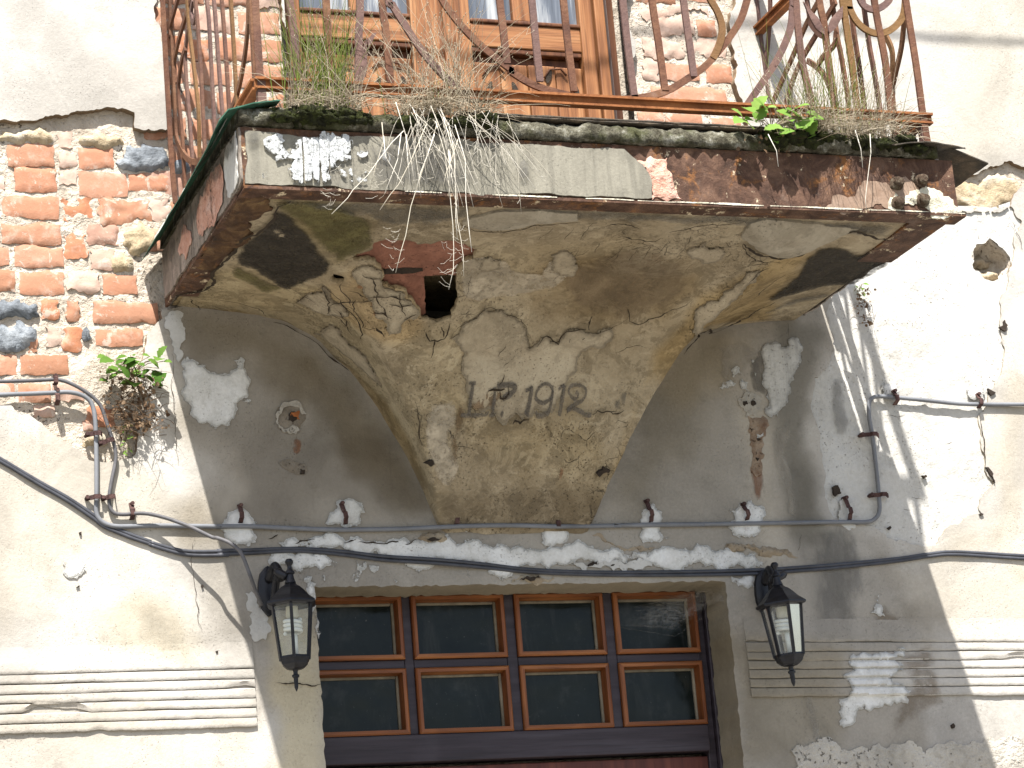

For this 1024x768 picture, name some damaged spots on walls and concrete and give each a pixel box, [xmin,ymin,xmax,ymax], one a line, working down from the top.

spalling [637,156,682,202]
spalling [0,0,285,462]
water stain [234,203,371,292]
peeling [351,264,420,336]
crack [174,201,692,424]
water stain [770,249,888,301]
peeling [811,163,1024,547]
hole [275,400,306,434]
peeling [720,337,803,477]
peeling [268,531,798,639]
peeling [838,647,911,728]
spalling [791,723,1024,768]